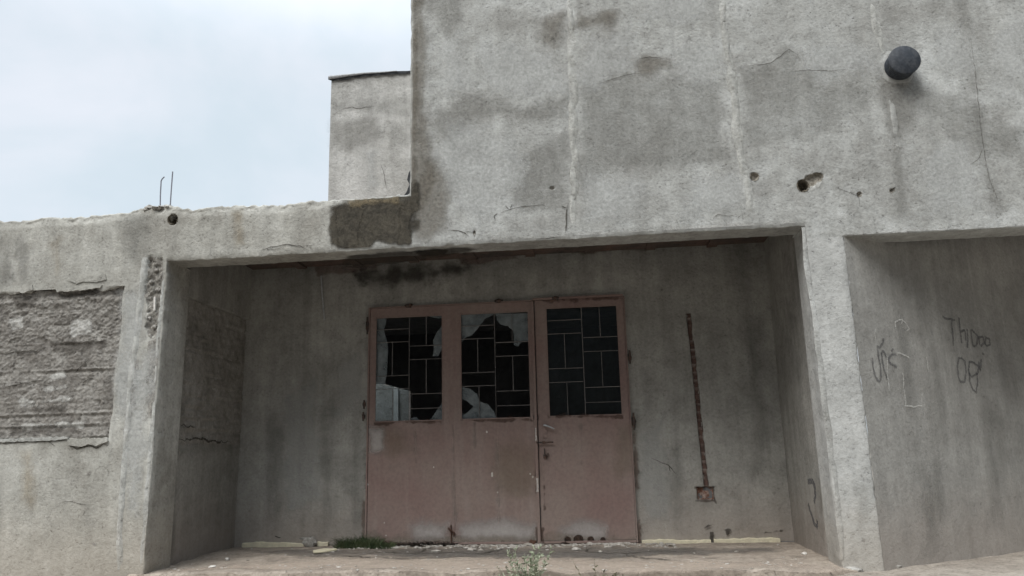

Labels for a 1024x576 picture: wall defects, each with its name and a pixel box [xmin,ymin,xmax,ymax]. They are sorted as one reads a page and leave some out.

damp [329,144,473,284]
crack [494,205,567,239]
spalling [797,172,823,192]
spalling [0,257,163,449]